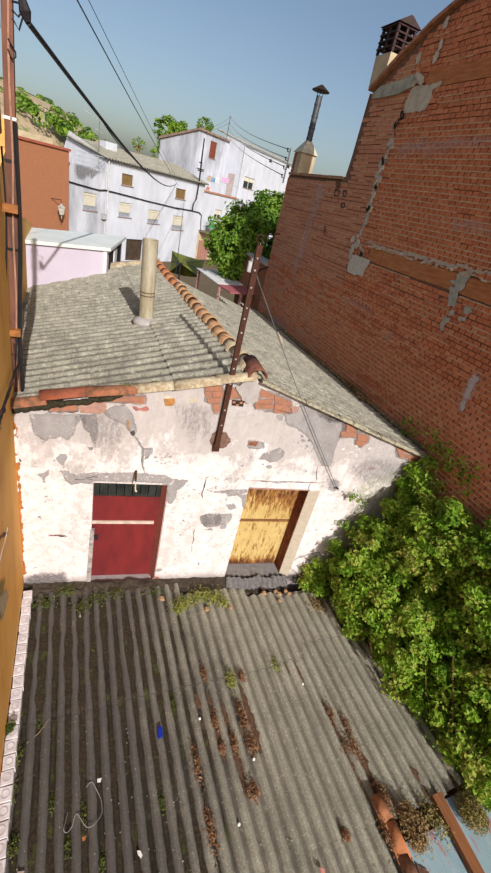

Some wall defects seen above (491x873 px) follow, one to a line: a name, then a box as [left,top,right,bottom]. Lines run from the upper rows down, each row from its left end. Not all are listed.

crack [348,119,491,274]
water stain [459,375,479,412]
flaking render [29,394,147,451]
crack [126,420,151,473]
flaking render [204,384,371,484]
flaking render [395,447,426,463]
flaking render [53,447,248,536]